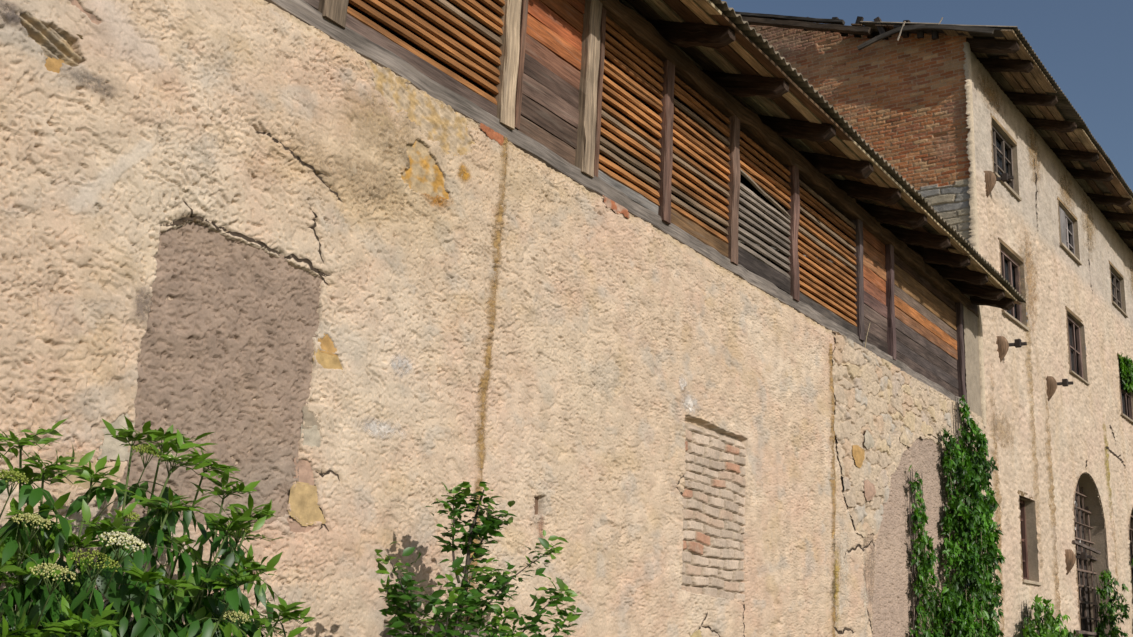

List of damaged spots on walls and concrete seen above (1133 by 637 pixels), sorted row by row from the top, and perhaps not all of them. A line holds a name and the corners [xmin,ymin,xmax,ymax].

flaking render [16,12,83,73]
flaking render [69,0,101,25]
crack [160,131,343,284]
flaking render [313,334,343,372]
flaking render [287,406,326,535]